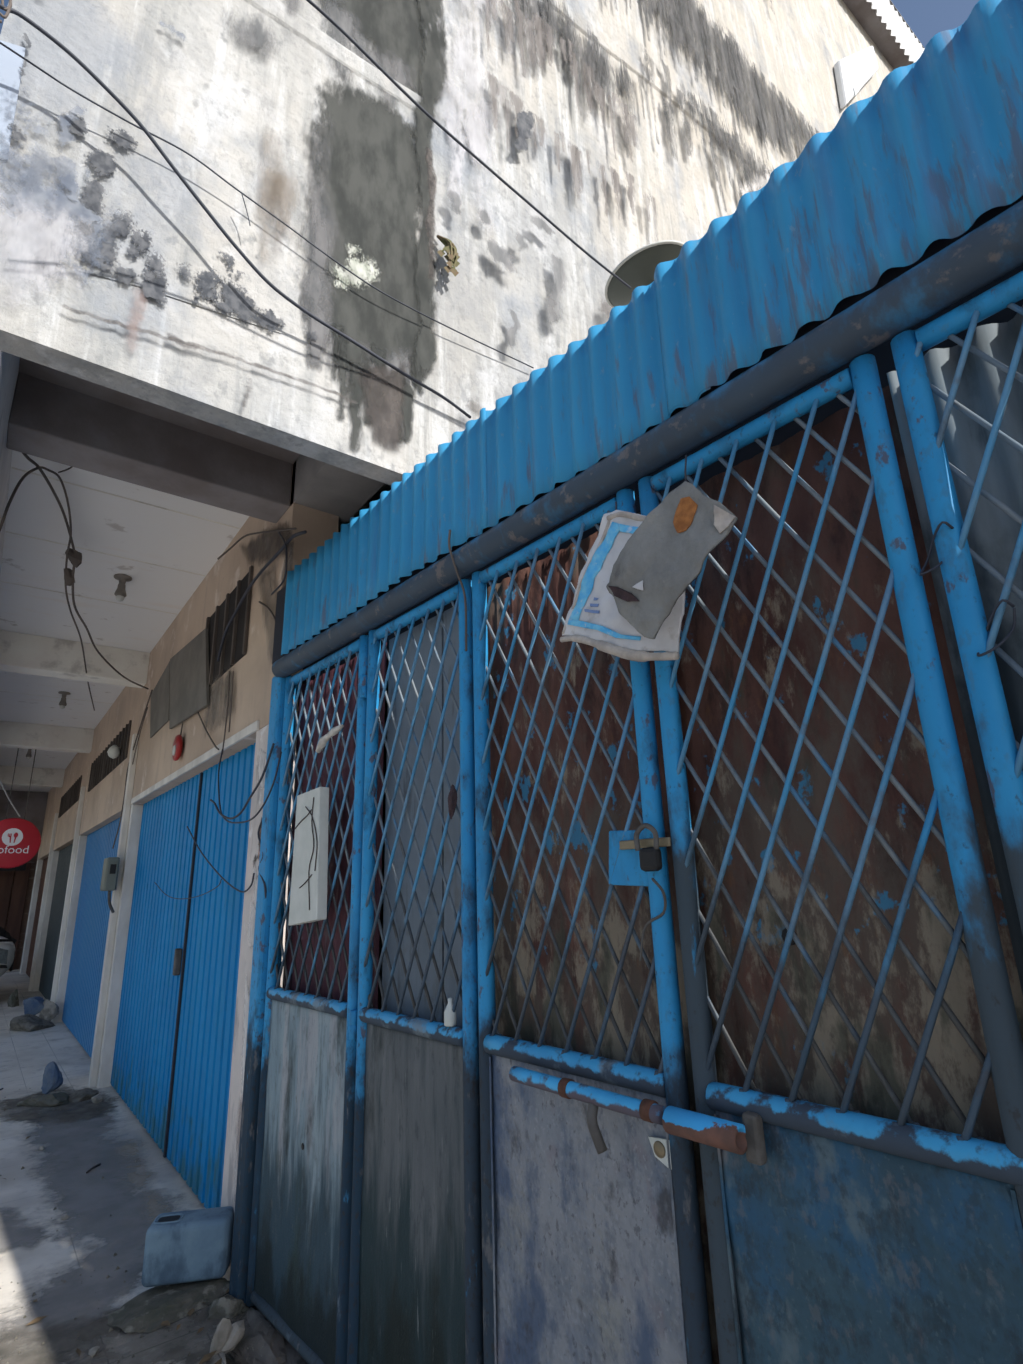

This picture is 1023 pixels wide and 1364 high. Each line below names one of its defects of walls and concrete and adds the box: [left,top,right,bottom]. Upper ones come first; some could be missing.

water stain [447,0,819,242]
water stain [0,33,138,283]
water stain [302,0,434,451]
water stain [487,233,528,272]
water stain [141,268,169,305]
water stain [547,255,565,322]
water stain [507,310,520,347]
rust [673,497,698,533]